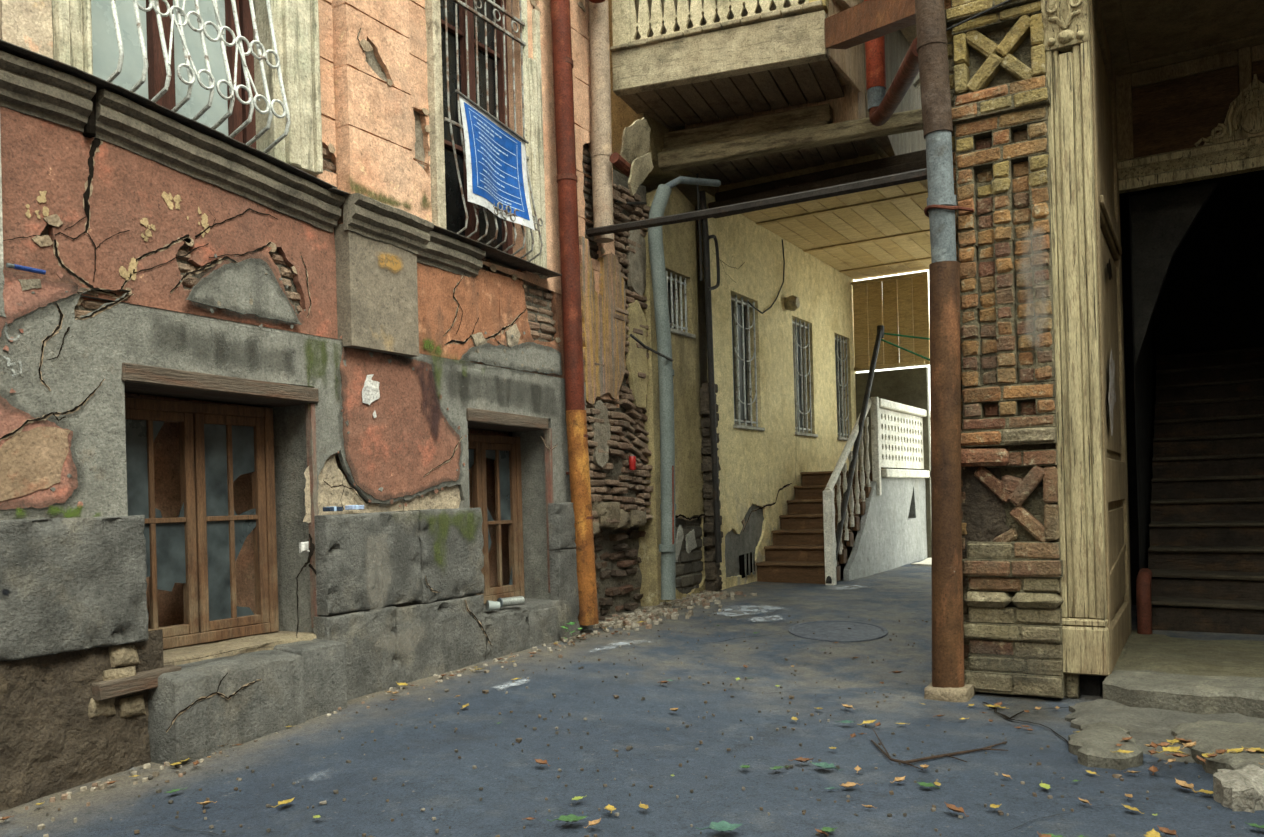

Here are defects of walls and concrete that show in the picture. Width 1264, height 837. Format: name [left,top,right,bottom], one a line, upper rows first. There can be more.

flaking render [359,39,393,86]
peeling [0,257,138,351]
crack [0,93,277,441]
peeling [140,218,156,242]
flaking render [162,192,217,291]
flaking render [266,241,303,314]
crack [301,256,311,318]
crack [443,273,527,348]
peeling [0,389,83,510]
peeling [303,336,466,523]
spalling [675,383,765,594]
crack [163,534,316,733]